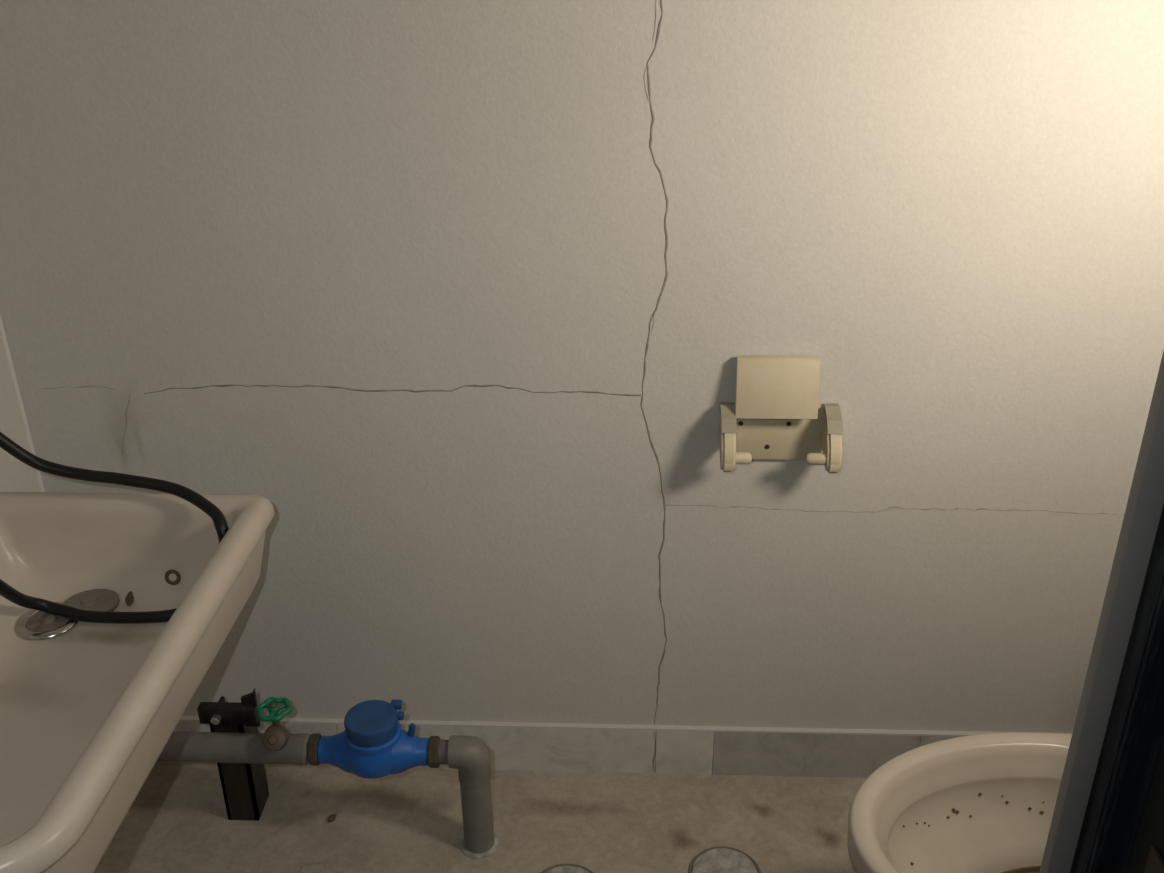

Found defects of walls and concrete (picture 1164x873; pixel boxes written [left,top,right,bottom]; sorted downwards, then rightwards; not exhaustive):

crack [144,0,1124,770]